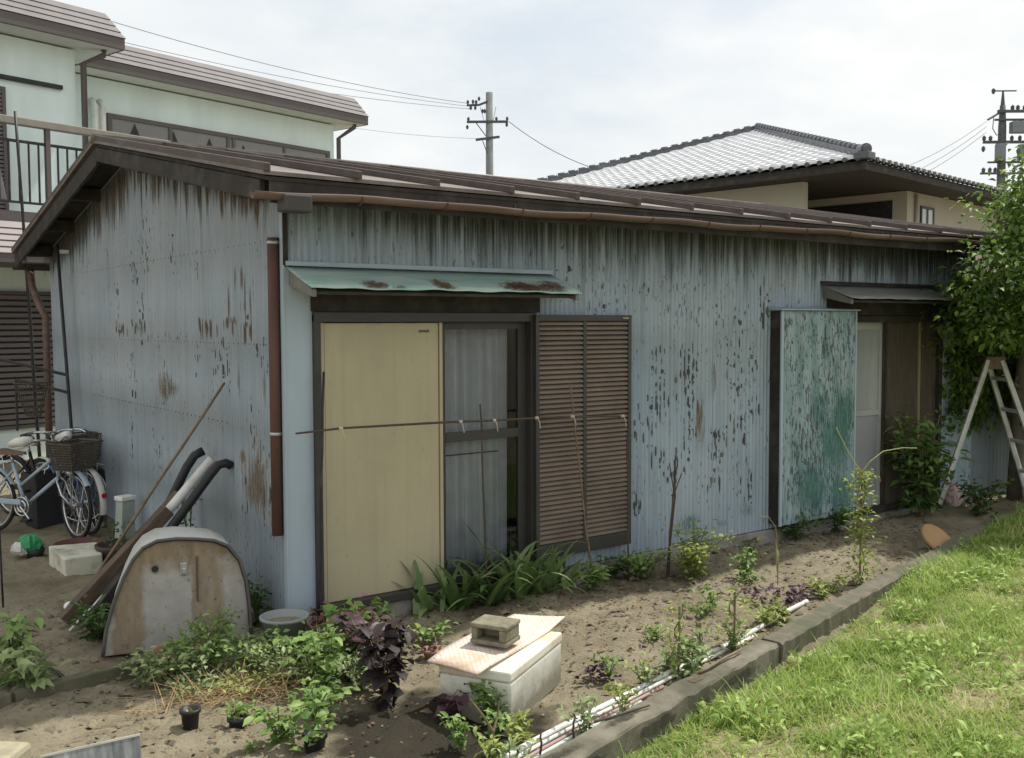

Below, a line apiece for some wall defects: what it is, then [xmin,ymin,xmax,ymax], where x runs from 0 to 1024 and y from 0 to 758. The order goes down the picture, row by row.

damp [48,170,127,268]
damp [454,216,639,255]
damp [652,230,796,272]
damp [810,242,972,279]
rust [198,268,252,343]
rust [501,281,567,291]
peeling [785,341,853,512]